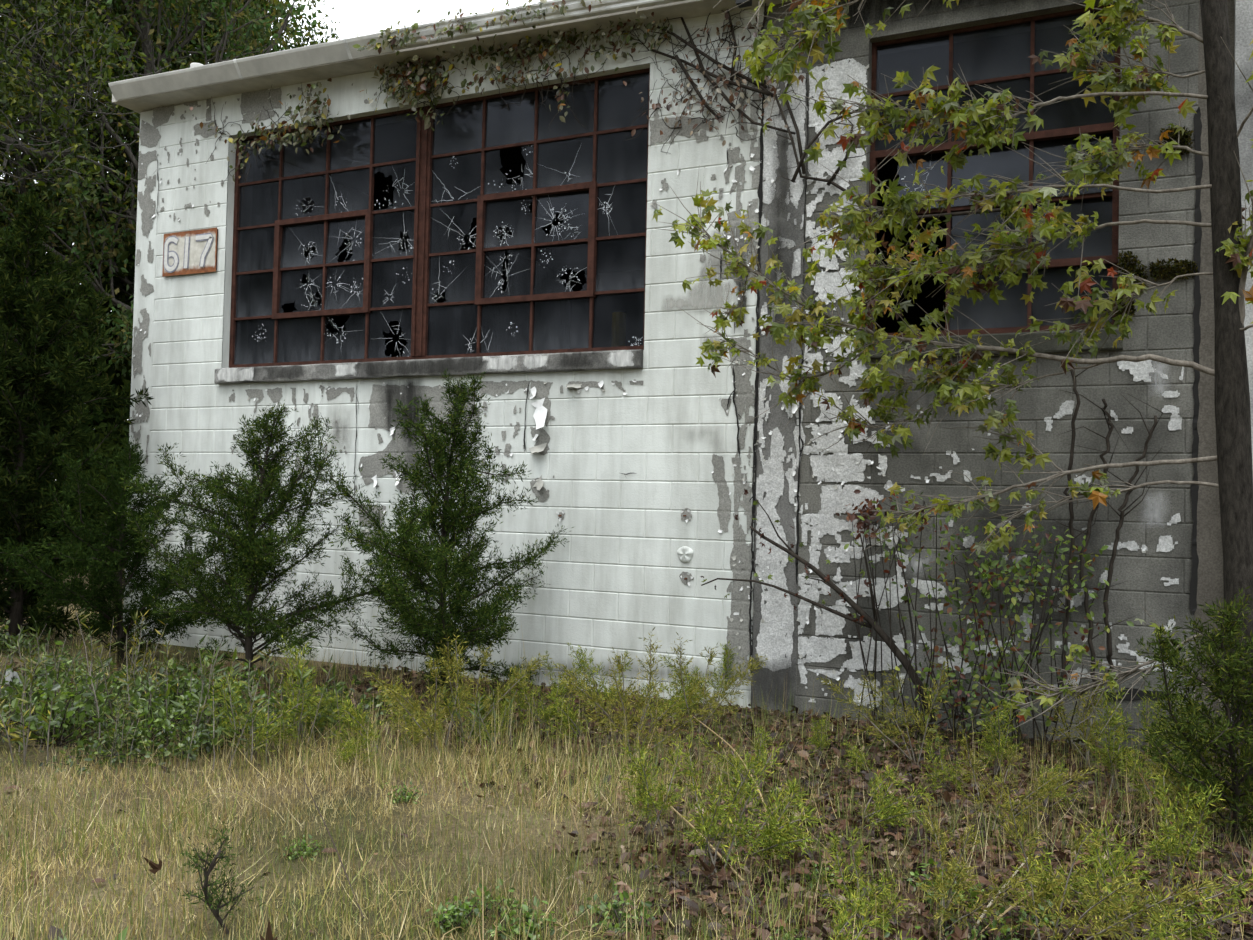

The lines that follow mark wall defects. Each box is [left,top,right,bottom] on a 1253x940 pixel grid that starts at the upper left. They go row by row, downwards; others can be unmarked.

peeling [131,83,315,464]
peeling [217,350,644,494]
peeling [649,58,1108,709]
peeling [1110,410,1133,434]
peeling [1117,360,1184,430]
peeling [530,475,554,502]
peeling [1104,513,1181,553]
peeling [1037,619,1188,689]